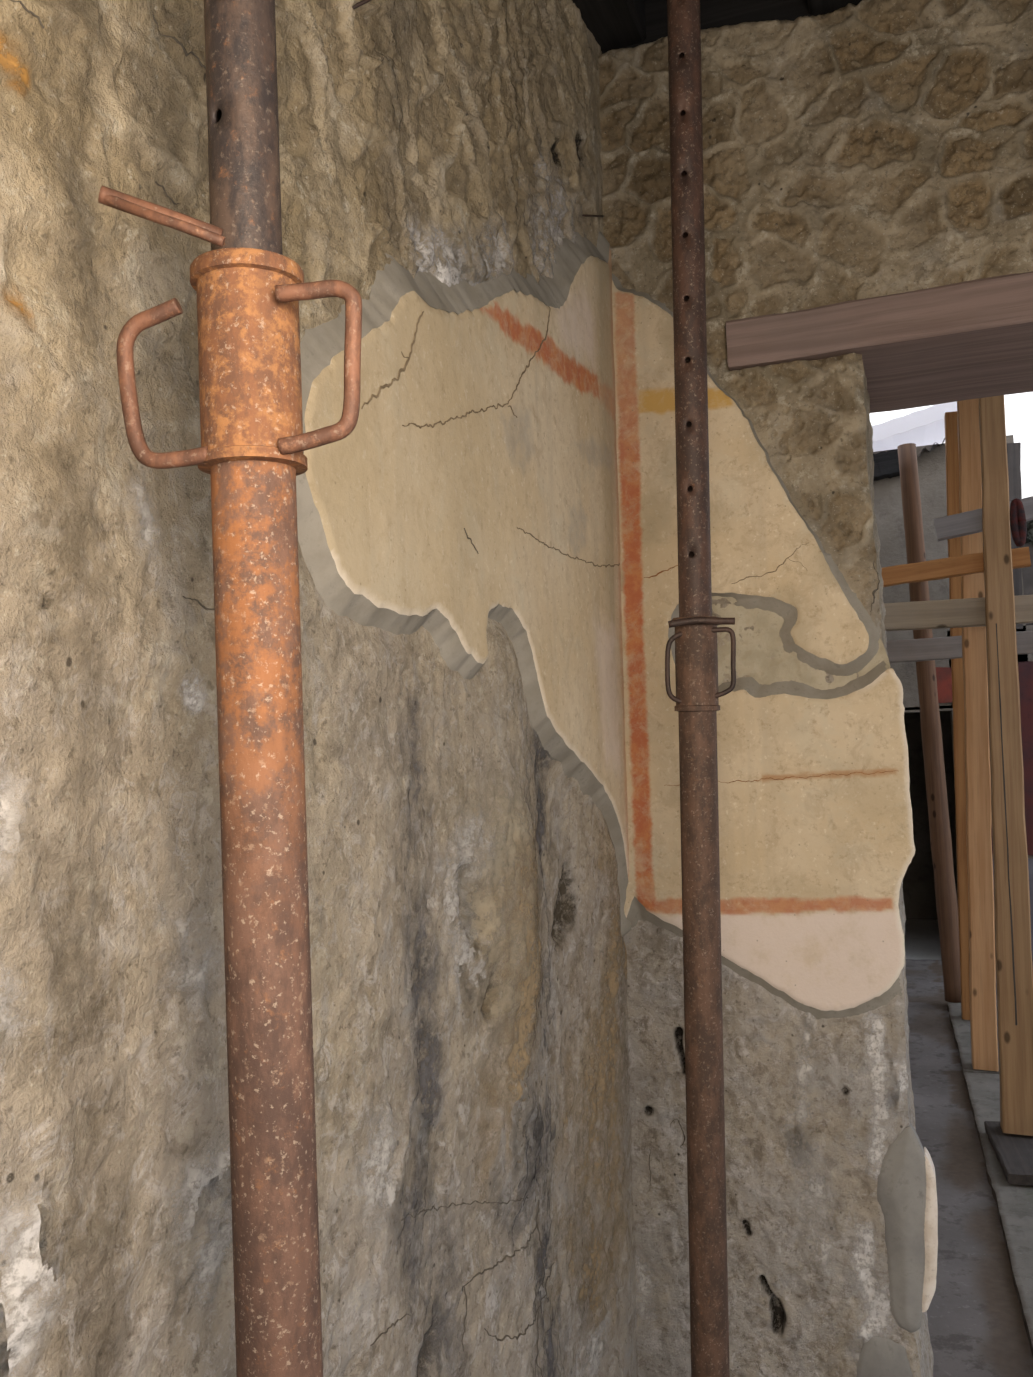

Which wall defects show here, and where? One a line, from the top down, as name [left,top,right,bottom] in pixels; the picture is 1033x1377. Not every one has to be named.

crack [361,311,424,409]
crack [402,306,551,429]
crack [517,527,678,578]
flaking render [712,596,890,690]
flaking render [456,865,482,950]
flaking render [551,867,576,945]
spalling [675,1027,685,1074]
crack [370,1314,411,1346]
flaking render [417,1331,430,1373]
crack [401,1197,555,1377]
spalling [760,1275,786,1332]
flaking render [856,1122,938,1377]